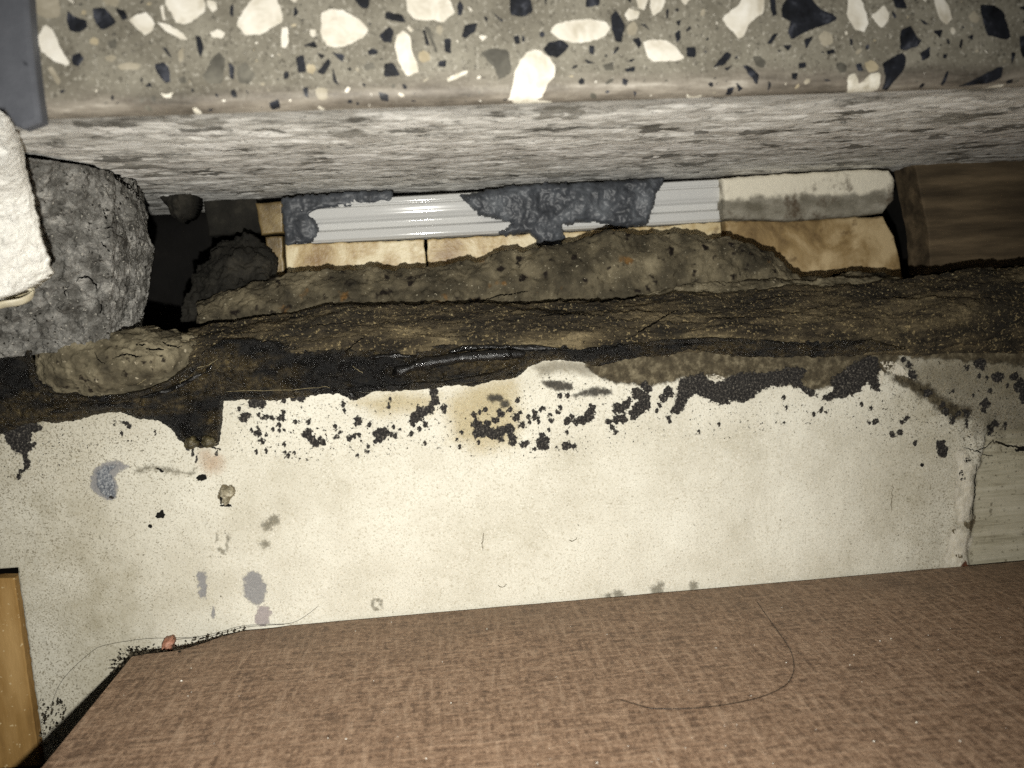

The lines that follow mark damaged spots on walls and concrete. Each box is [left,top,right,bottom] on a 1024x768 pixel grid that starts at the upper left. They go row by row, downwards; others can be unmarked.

water stain [231,351,1024,463]
water stain [0,419,157,490]
crack [966,439,1020,518]